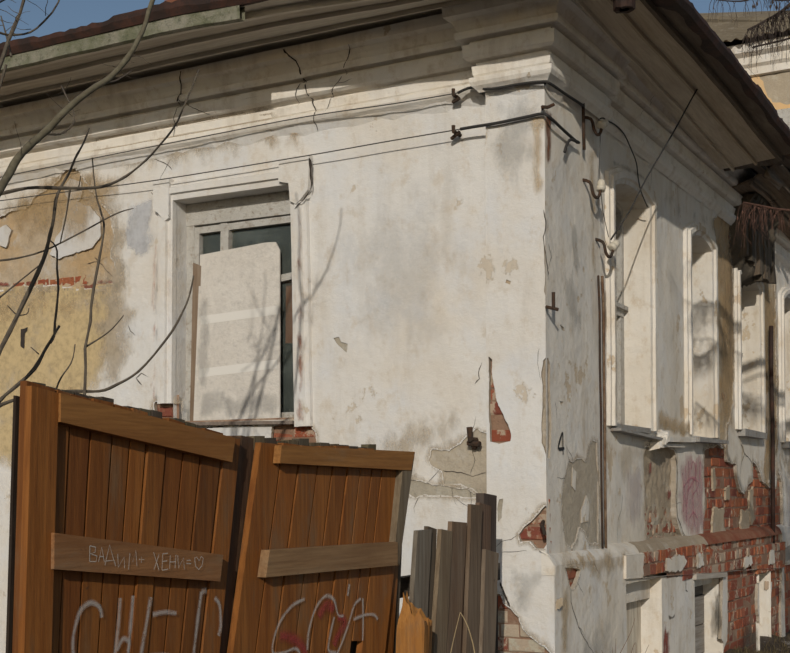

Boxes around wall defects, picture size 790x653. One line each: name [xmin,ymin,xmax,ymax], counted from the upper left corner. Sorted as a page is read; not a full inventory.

crack [173,71,207,136]
crack [283,44,350,130]
peeling [0,169,122,294]
spalling [151,395,317,443]
peeling [409,358,511,514]
spalling [640,216,790,653]
spalling [497,499,552,548]
peeling [557,441,600,592]
spalling [497,582,550,653]